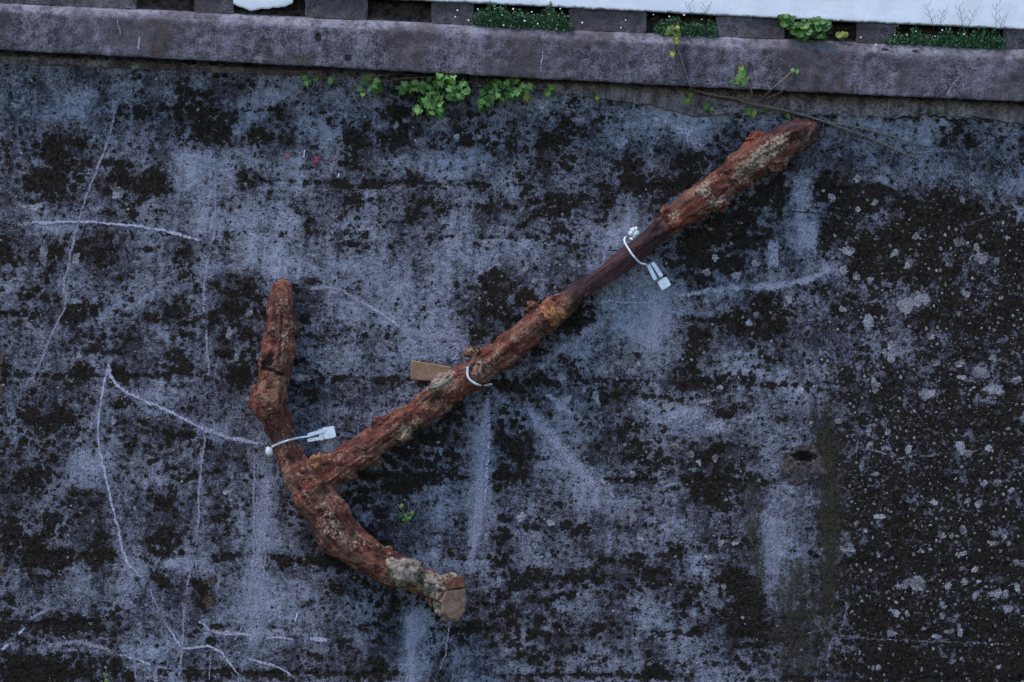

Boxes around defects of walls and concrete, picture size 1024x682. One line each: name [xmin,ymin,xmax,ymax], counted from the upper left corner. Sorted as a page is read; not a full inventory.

leakage [539,321,606,370]
leakage [631,265,832,353]
leakage [546,394,573,420]
leakage [467,392,493,569]
leakage [526,406,614,503]
spalling [779,444,828,486]
leakage [240,472,277,656]
leakage [743,404,849,680]
leakage [404,610,423,682]